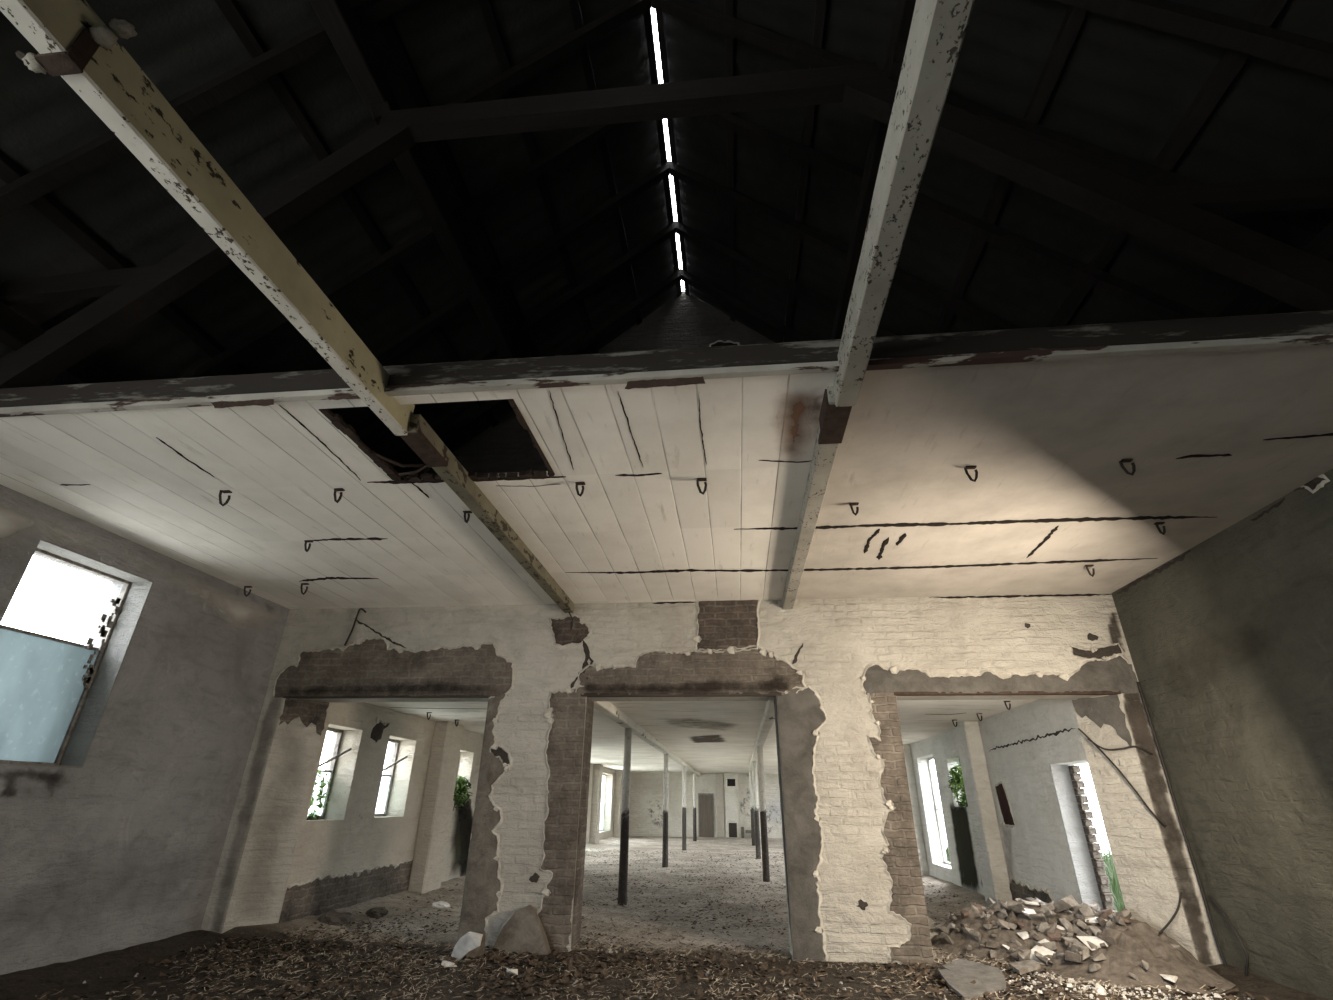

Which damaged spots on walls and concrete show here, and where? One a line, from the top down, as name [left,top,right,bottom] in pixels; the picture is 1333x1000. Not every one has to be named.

crack [156,437,214,477]
peeling [211,399,274,408]
spalling [319,395,444,483]
crack [279,391,574,498]
spalling [468,399,555,480]
corrosion [787,397,819,451]
crack [1251,478,1316,521]
crack [565,515,1215,604]
crack [357,620,406,648]
flaking render [272,637,515,945]
flaking render [529,600,828,961]
flaking render [860,633,1140,965]